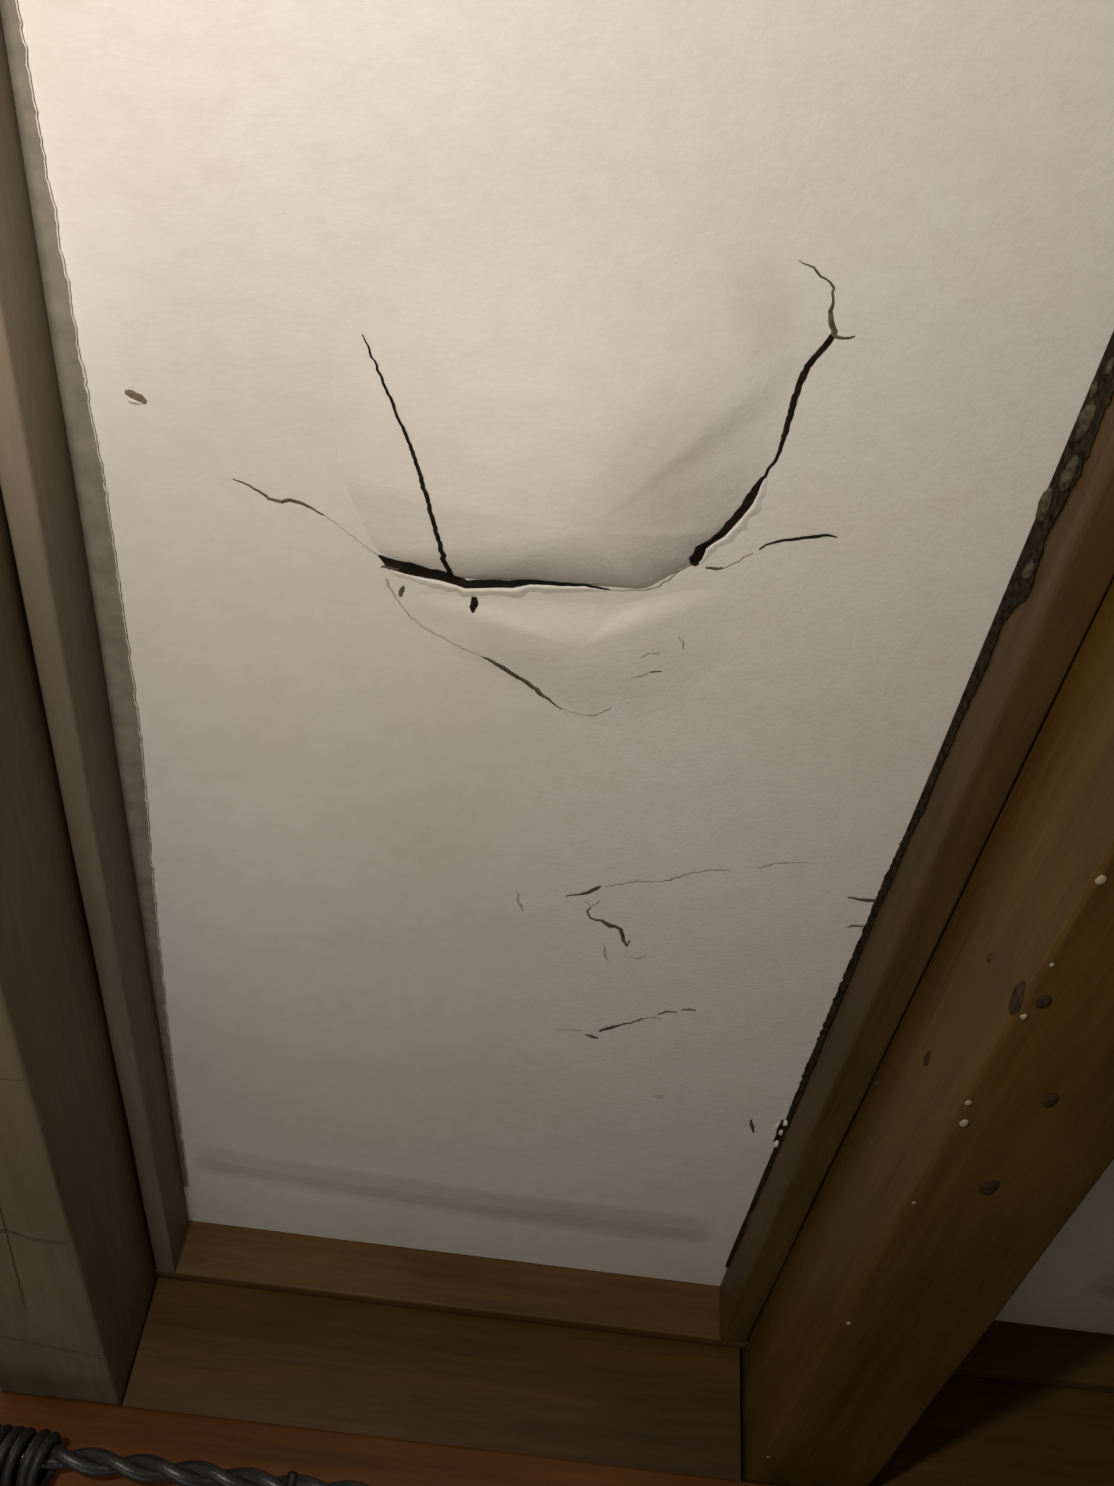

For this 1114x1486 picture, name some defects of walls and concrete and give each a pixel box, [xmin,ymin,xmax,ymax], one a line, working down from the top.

crack [233,260,855,716]
crack [567,861,807,961]
crack [555,1009,693,1039]